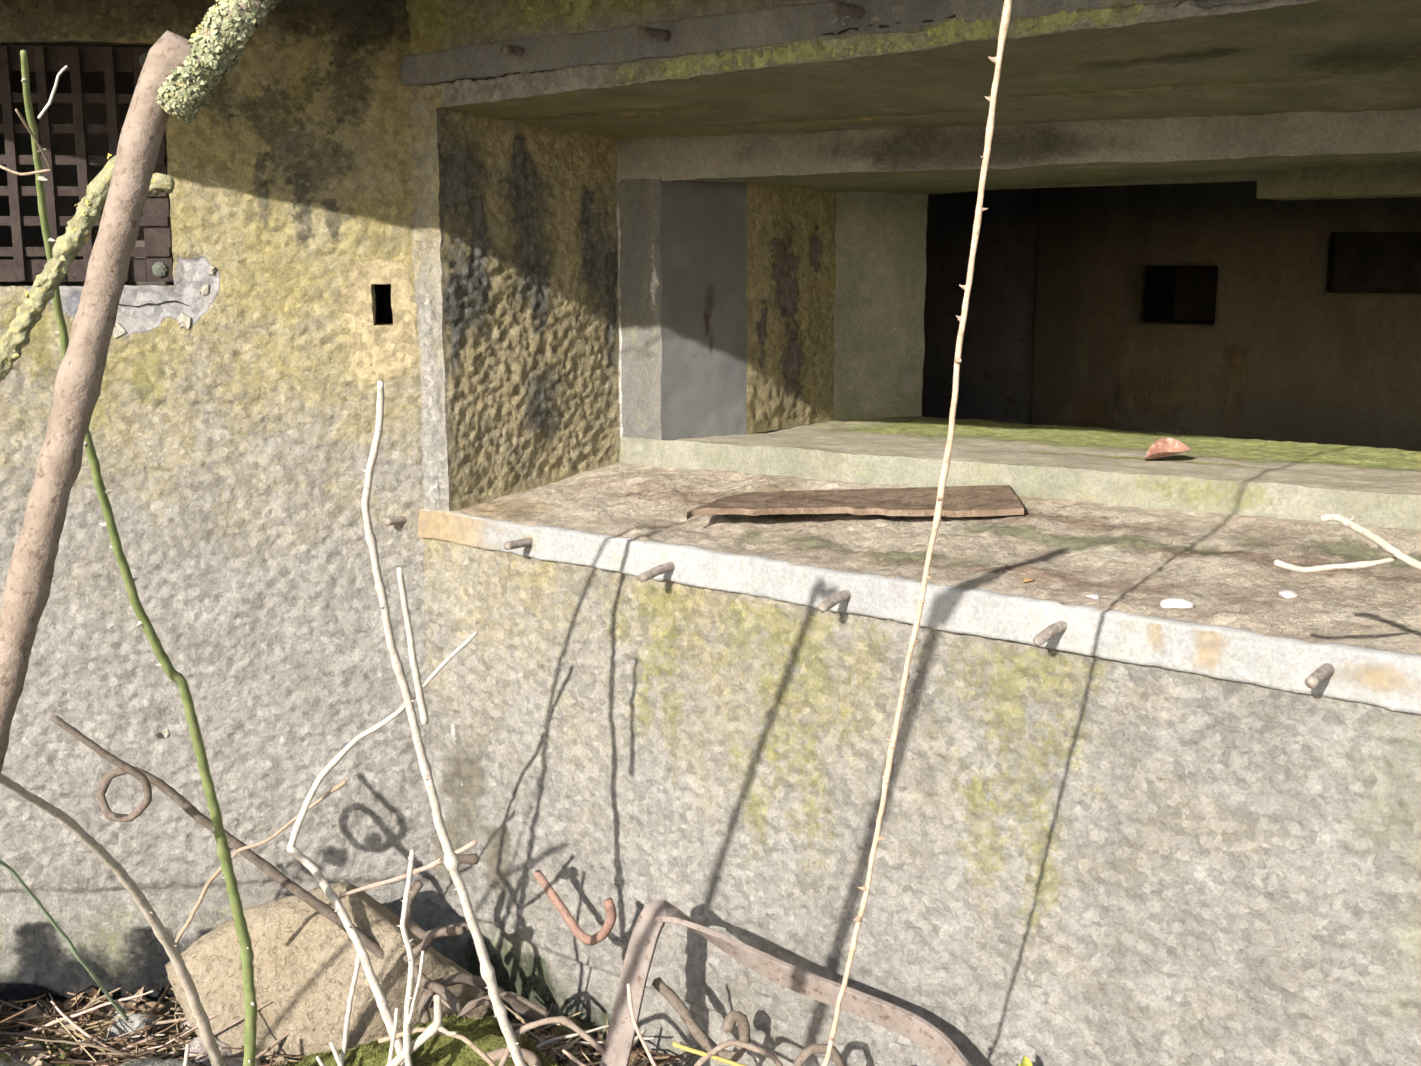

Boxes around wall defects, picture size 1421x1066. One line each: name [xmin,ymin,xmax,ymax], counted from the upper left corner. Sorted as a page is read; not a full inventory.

spalling [49,286,84,317]
spalling [112,257,220,339]
water stain [421,113,492,373]
water stain [501,135,552,334]
water stain [581,189,623,437]
water stain [650,242,659,305]
water stain [525,371,560,438]